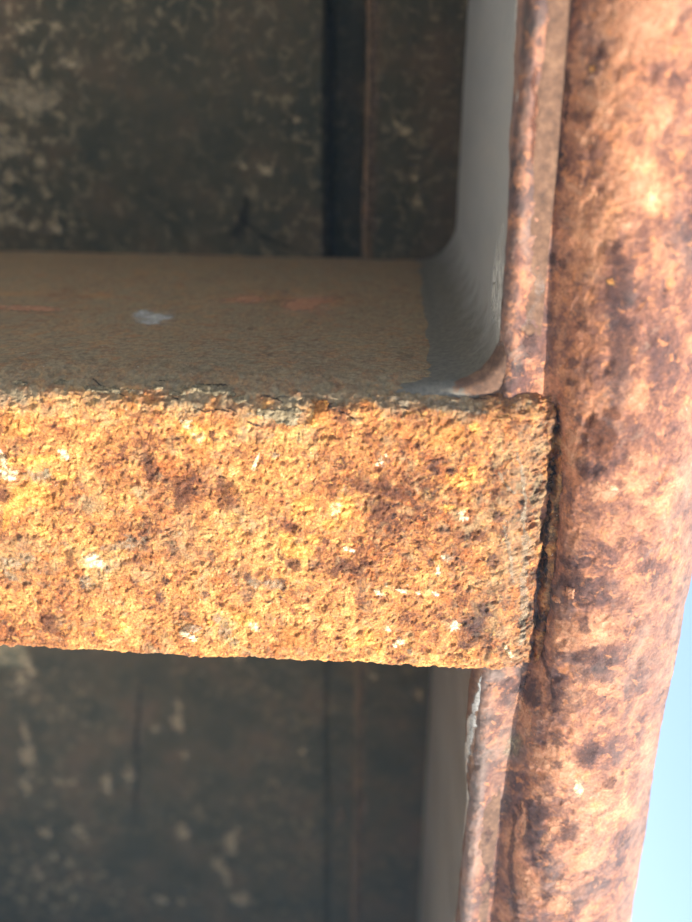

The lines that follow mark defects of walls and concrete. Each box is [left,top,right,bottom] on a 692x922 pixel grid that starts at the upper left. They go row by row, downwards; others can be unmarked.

rust [0,453,74,531]
rust [178,420,215,447]
rust [278,472,407,571]
rust [428,463,478,490]
rust [443,504,468,521]
crack [538,457,556,579]
rust [556,400,621,505]
rust [327,560,374,578]
rust [174,620,212,642]
crack [534,626,555,695]
rust [532,733,584,796]
rust [516,790,579,853]